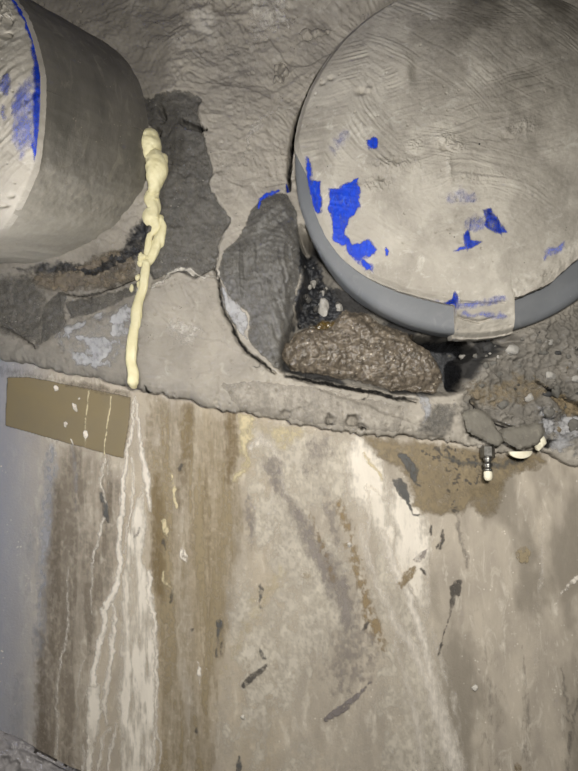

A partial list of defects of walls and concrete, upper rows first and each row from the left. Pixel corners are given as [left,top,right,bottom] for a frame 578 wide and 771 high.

crack [288,128,297,192]
spalling [0,220,151,368]
crack [74,280,135,297]
spalling [282,248,525,393]
spalling [532,331,578,382]
water stain [36,90,546,771]
peeling [499,371,578,450]